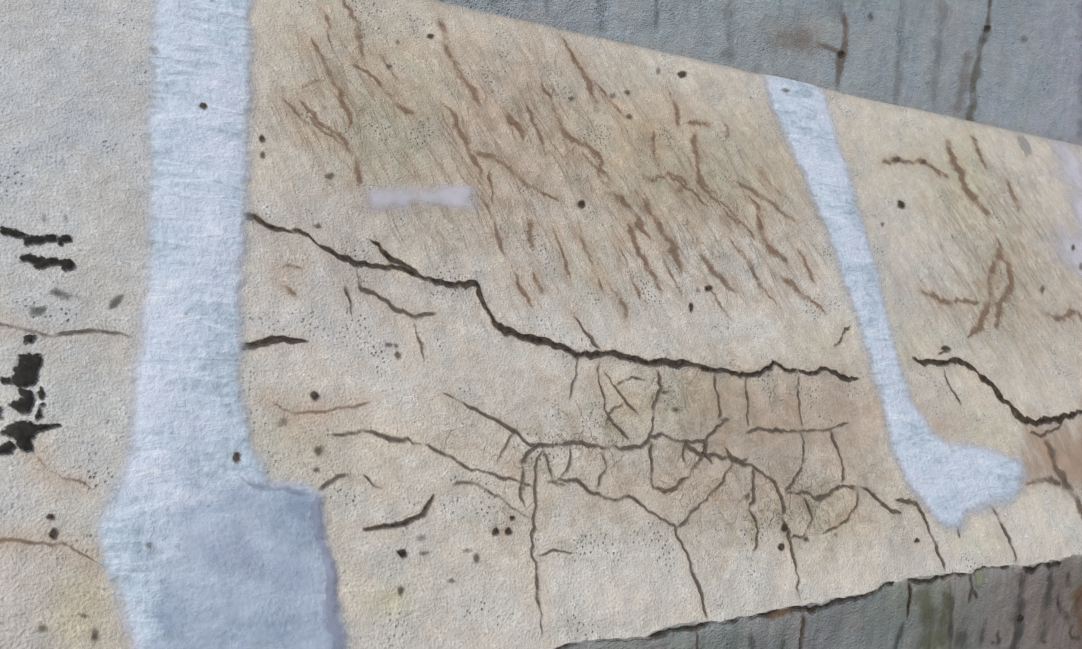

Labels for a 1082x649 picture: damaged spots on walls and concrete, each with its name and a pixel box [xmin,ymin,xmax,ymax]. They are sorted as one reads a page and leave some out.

crack [284,1,413,183]
crack [562,38,621,113]
crack [439,21,558,306]
peeling [0,226,27,238]
peeling [56,234,72,245]
crack [241,83,1082,649]
peeling [0,376,61,455]